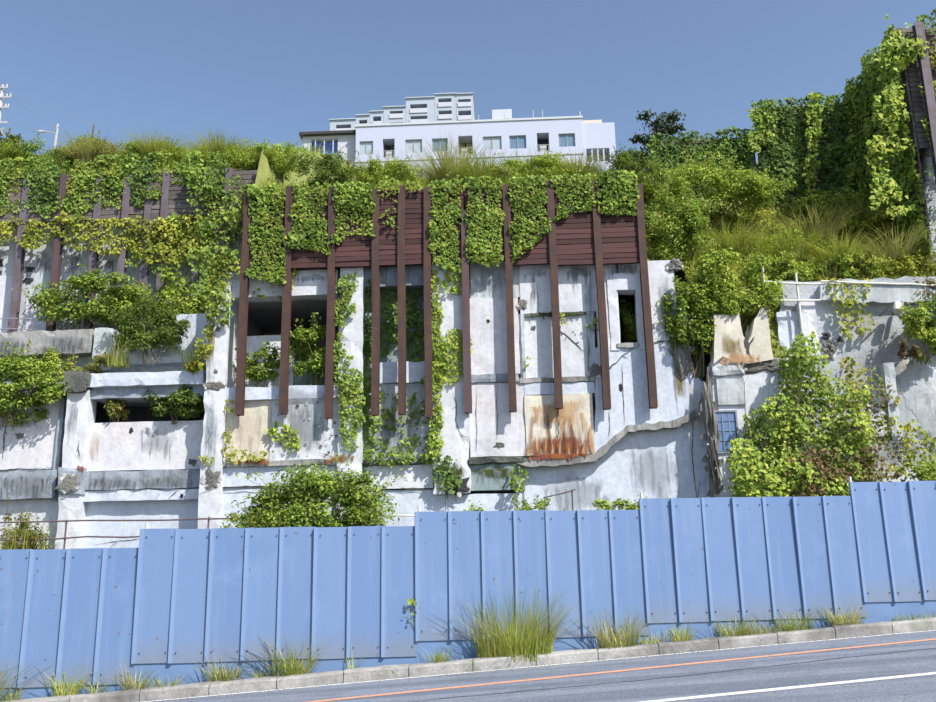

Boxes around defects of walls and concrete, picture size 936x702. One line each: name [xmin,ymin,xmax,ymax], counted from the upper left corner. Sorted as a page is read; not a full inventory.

crack [453,385,498,448]
rust [526,402,595,462]
leakage [0,476,49,503]
spalling [55,473,79,494]
spalling [200,469,223,489]